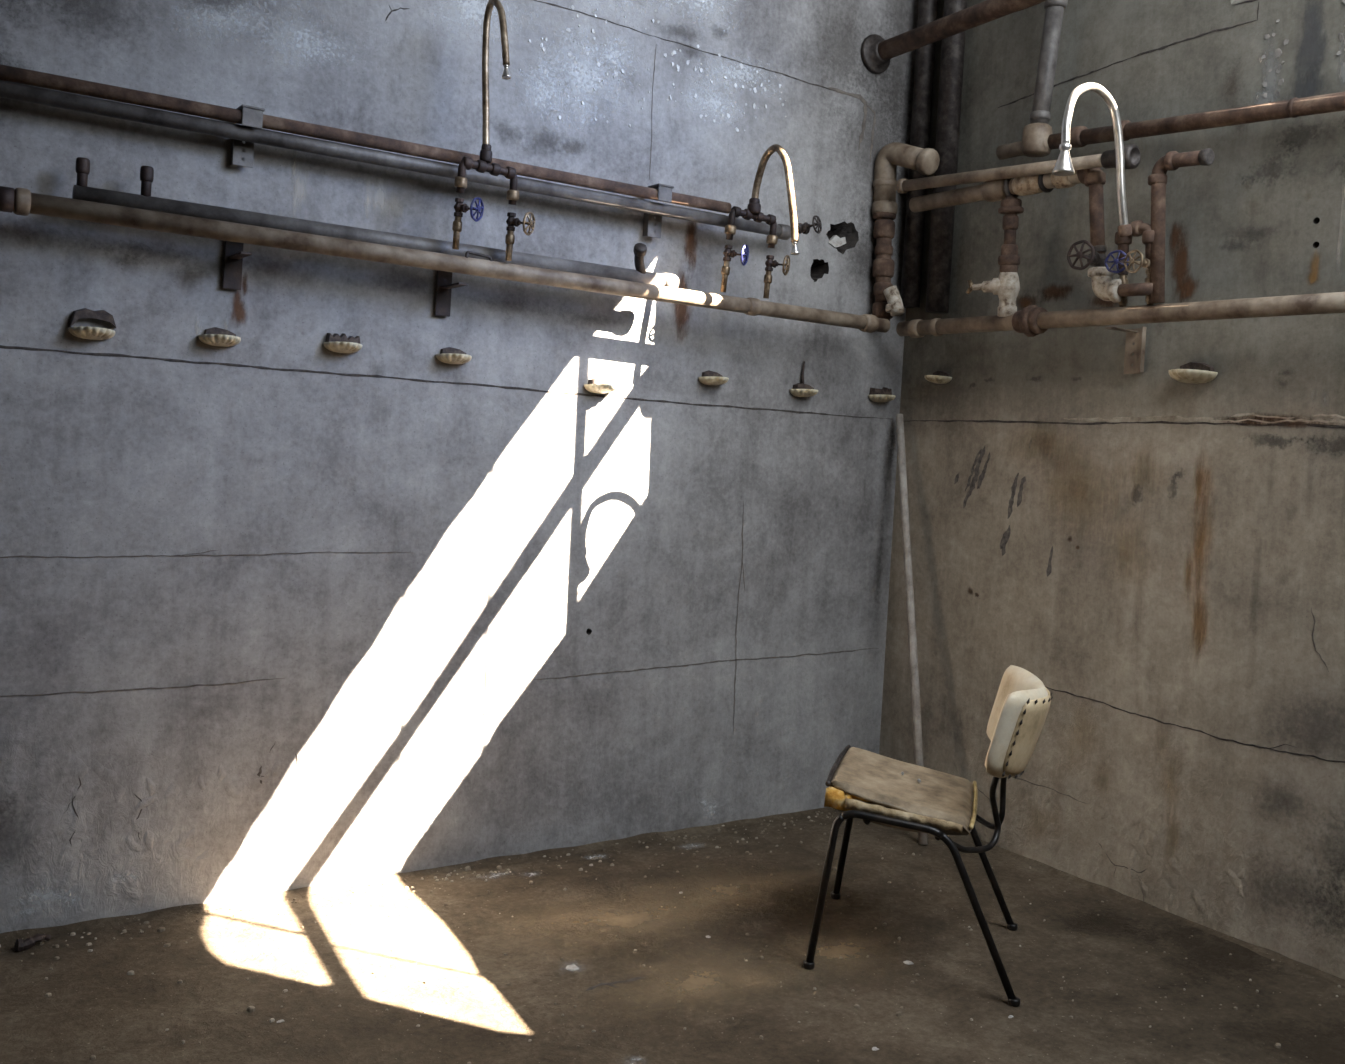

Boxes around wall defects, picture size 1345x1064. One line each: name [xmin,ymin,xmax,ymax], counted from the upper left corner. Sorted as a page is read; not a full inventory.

spalling [810,221,859,282]
crack [0,345,1345,428]
crack [1045,686,1345,763]